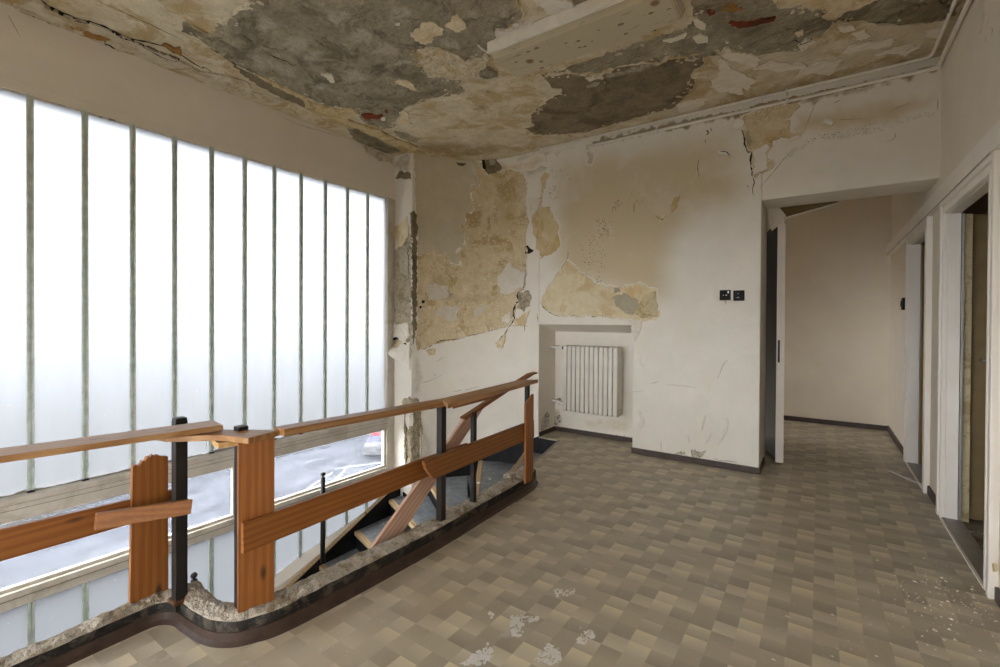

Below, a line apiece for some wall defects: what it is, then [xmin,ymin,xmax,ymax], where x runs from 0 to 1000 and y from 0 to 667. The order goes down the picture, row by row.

crack [9,1,292,72]
flaking render [13,0,587,179]
flaking render [521,0,966,179]
crack [742,131,787,196]
peeling [388,159,562,370]
crack [422,257,603,392]
peeling [541,259,661,341]
flaking render [402,396,427,464]